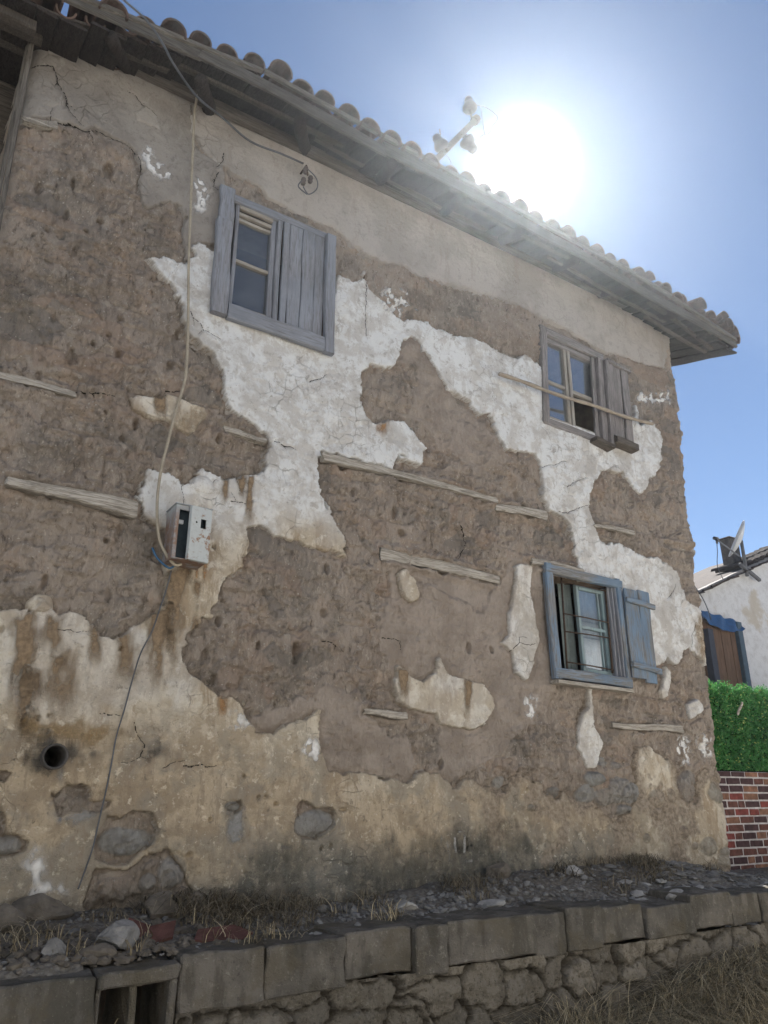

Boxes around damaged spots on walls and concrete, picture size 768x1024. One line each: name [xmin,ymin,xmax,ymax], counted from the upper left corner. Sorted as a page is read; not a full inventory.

crack [31,65,142,173]
flaking render [0,117,268,639]
flaking render [222,166,702,608]
leakage [10,612,108,744]
leakage [118,634,133,672]
leakage [148,568,201,677]
flaking render [181,337,717,818]